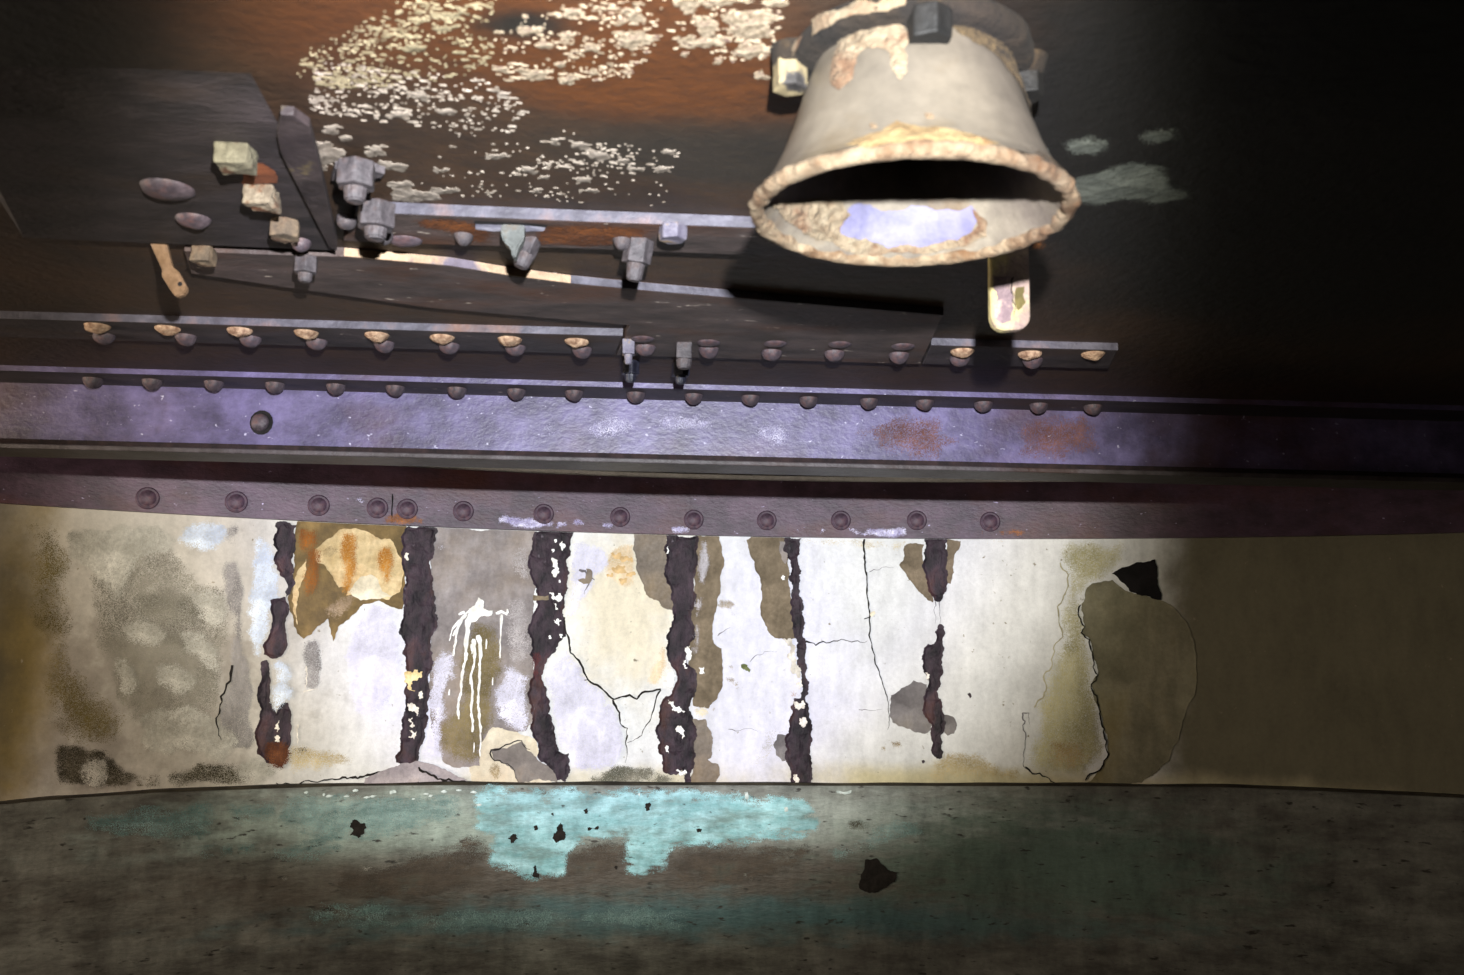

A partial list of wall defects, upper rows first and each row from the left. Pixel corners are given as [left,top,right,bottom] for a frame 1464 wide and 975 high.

corrosion [288,513,422,641]
spalling [194,521,821,933]
crack [563,617,661,762]
crack [806,539,893,728]
spalling [890,539,961,763]
flaking render [1078,559,1197,784]